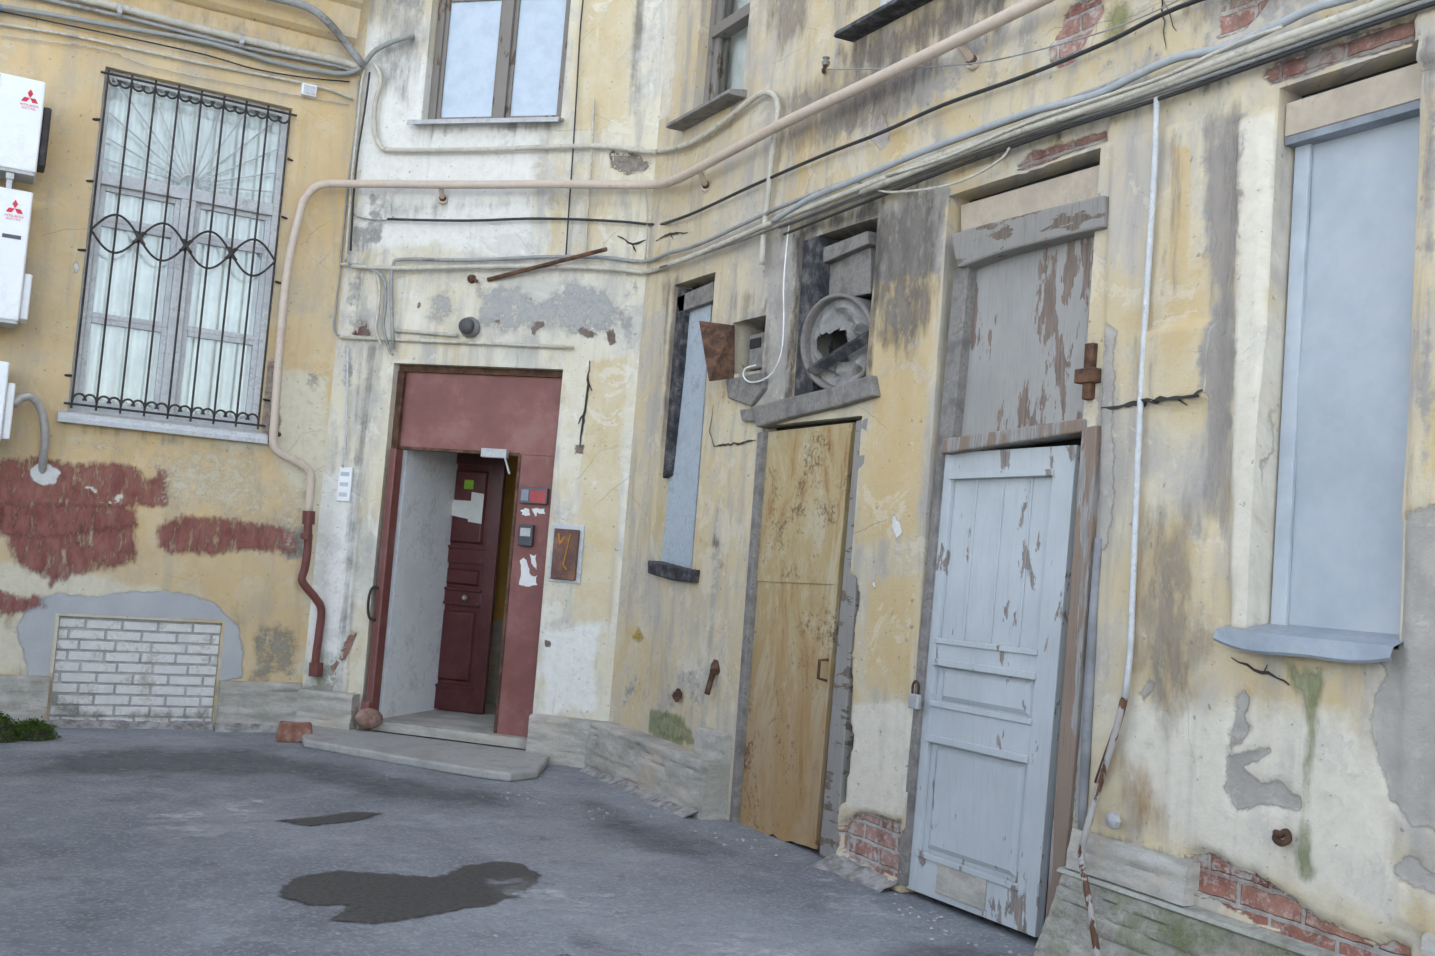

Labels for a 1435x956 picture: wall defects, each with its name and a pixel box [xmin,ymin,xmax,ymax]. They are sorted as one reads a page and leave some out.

flaking render [1049,0,1104,68]
flaking render [1217,0,1269,38]
spalling [609,150,649,175]
leakage [1204,110,1236,528]
flaking render [1096,323,1117,550]
crack [1101,389,1203,410]
peeling [0,464,137,614]
peeling [157,517,297,555]
crack [1231,657,1290,685]
flaking render [1370,504,1435,831]
flaking render [1224,690,1302,811]
flaking render [1184,853,1411,956]